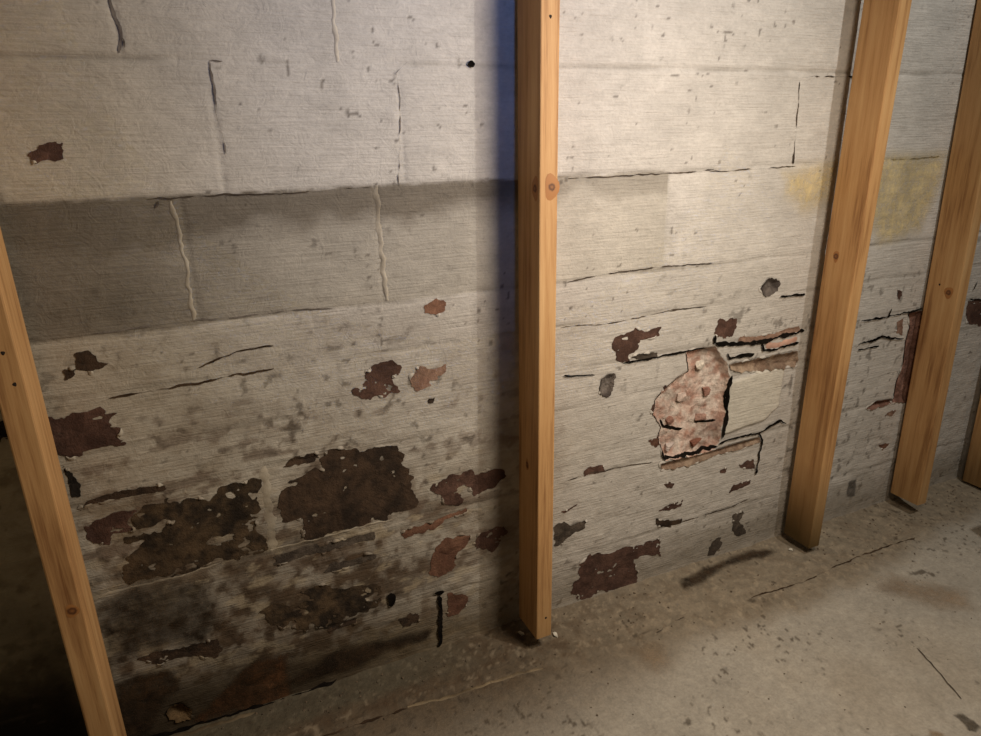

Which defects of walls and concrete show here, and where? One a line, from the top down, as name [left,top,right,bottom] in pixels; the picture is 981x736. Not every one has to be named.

crack [108,0,125,53]
peeling [28,142,64,165]
peeling [612,327,661,363]
peeling [352,360,446,403]
spalling [599,373,616,397]
spalling [649,316,800,493]
peeling [584,465,606,476]
peeling [48,407,421,633]
peeling [401,468,506,538]
peeling [429,526,508,577]
peeling [571,500,683,600]
leakage [117,671,178,736]